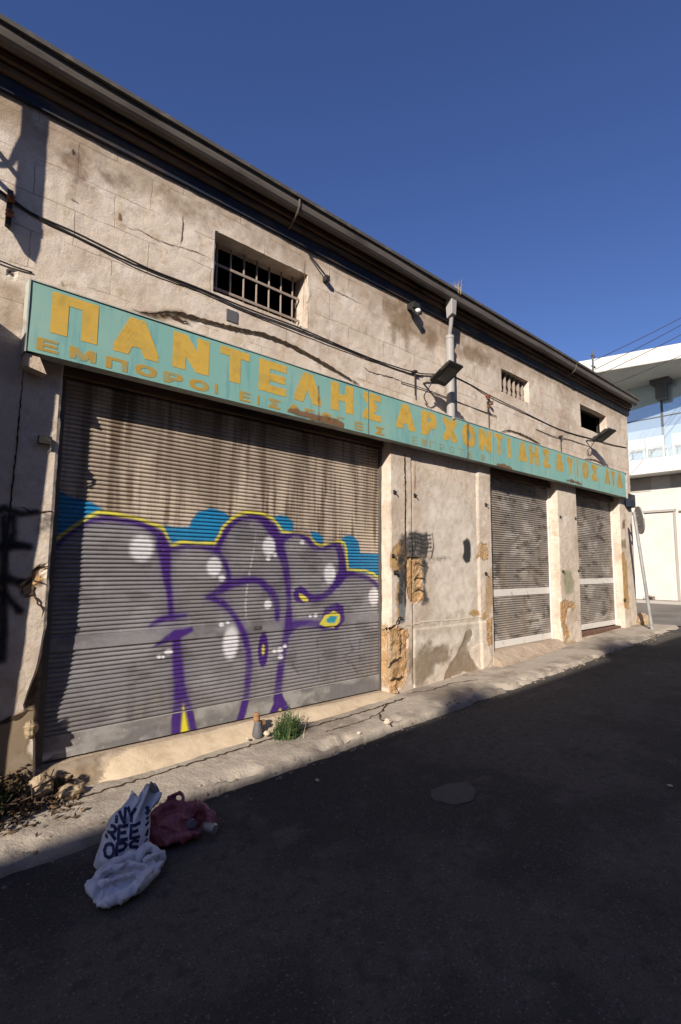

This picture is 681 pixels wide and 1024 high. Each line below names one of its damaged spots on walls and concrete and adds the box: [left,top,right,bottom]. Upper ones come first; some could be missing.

crack [133,309,402,385]
peeling [621,541,630,609]
peeling [97,482,493,783]
damp [406,630,478,686]
spalling [560,600,581,645]